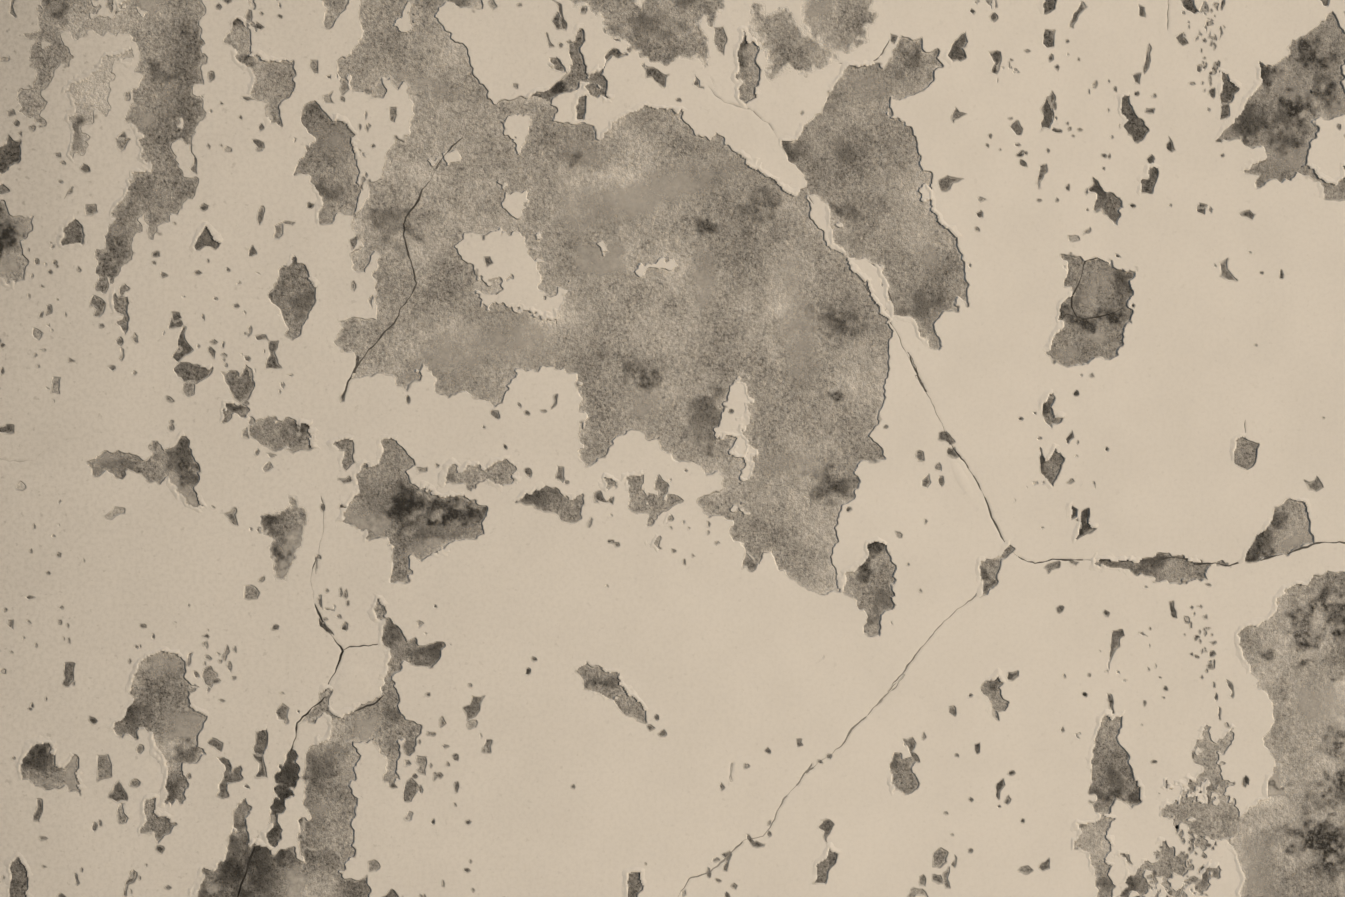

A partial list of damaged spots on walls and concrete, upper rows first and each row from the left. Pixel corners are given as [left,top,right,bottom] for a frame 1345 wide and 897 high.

crack [237,842,256,897]
crack [289,497,378,757]
crack [354,695,384,712]
crack [342,138,462,399]
peeling [0,0,984,897]
crack [681,593,977,891]
peeling [1042,228,1134,396]
crack [841,255,1345,566]
peeling [1088,45,1155,142]
peeling [1085,155,1160,224]
peeling [1045,477,1322,588]
peeling [1061,572,1345,897]